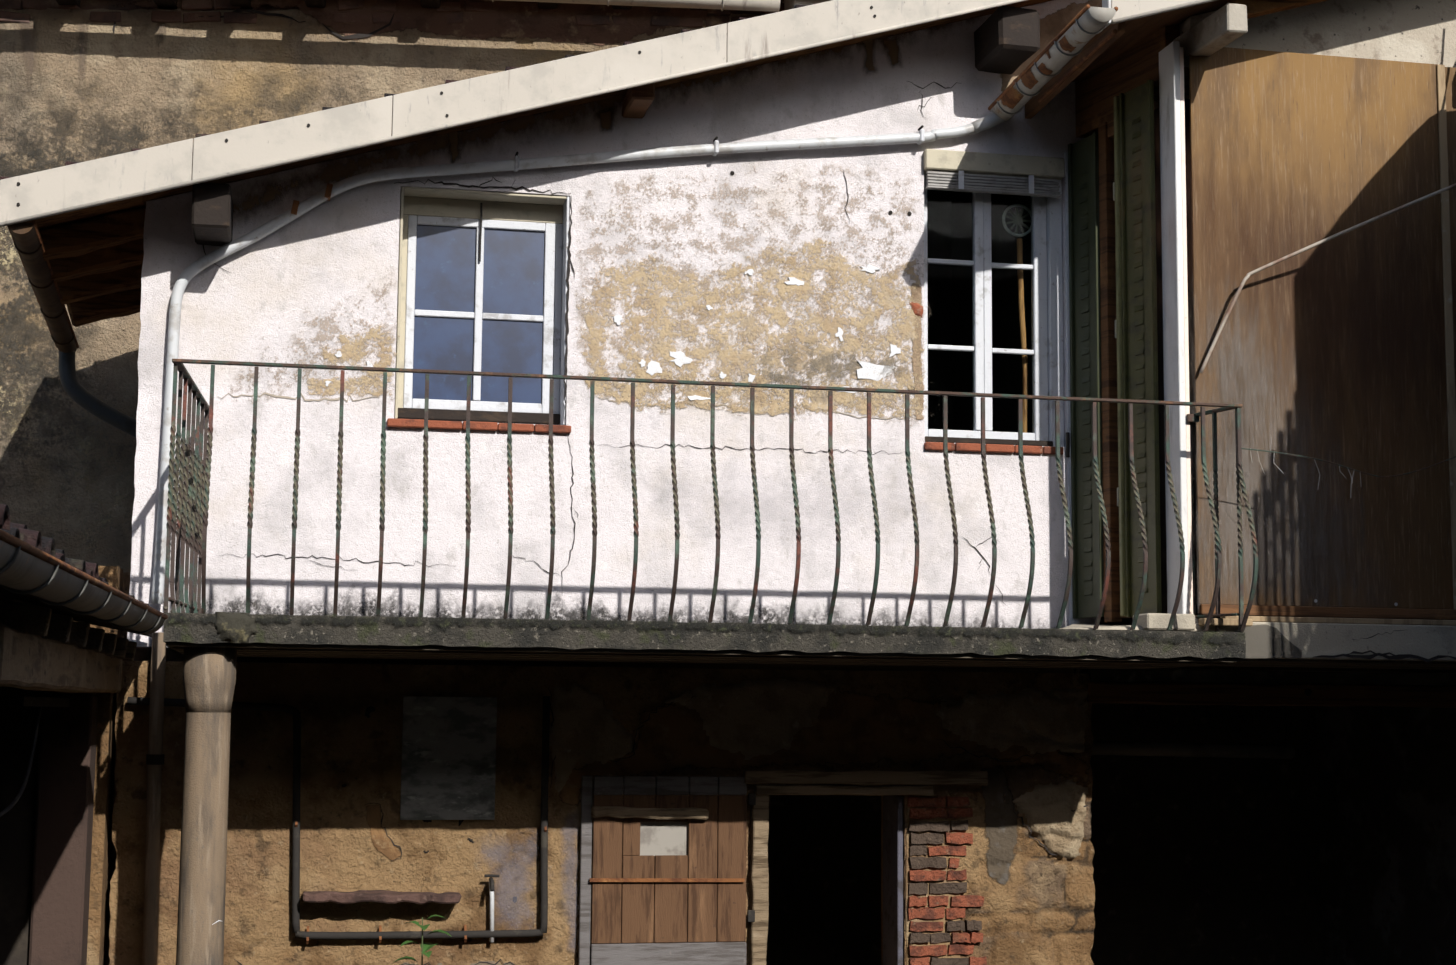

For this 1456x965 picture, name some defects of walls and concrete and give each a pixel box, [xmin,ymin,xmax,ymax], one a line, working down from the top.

peeling [239,284,396,398]
peeling [576,171,924,420]
crack [218,553,449,570]